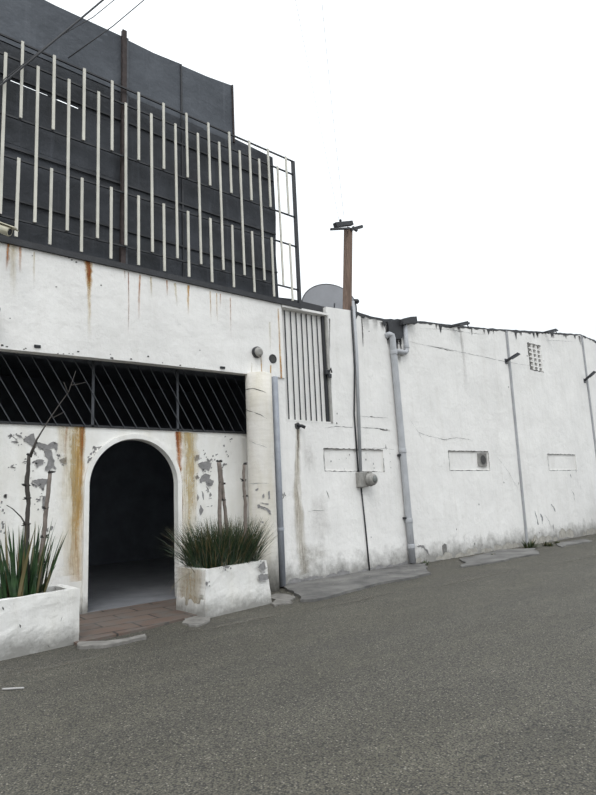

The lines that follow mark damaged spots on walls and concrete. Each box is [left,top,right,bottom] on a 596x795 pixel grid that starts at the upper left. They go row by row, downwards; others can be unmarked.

peeling [8,432,67,511]
corrosion [70,427,84,550]
corrosion [176,432,194,518]
peeling [193,436,232,520]
peeling [258,561,268,581]